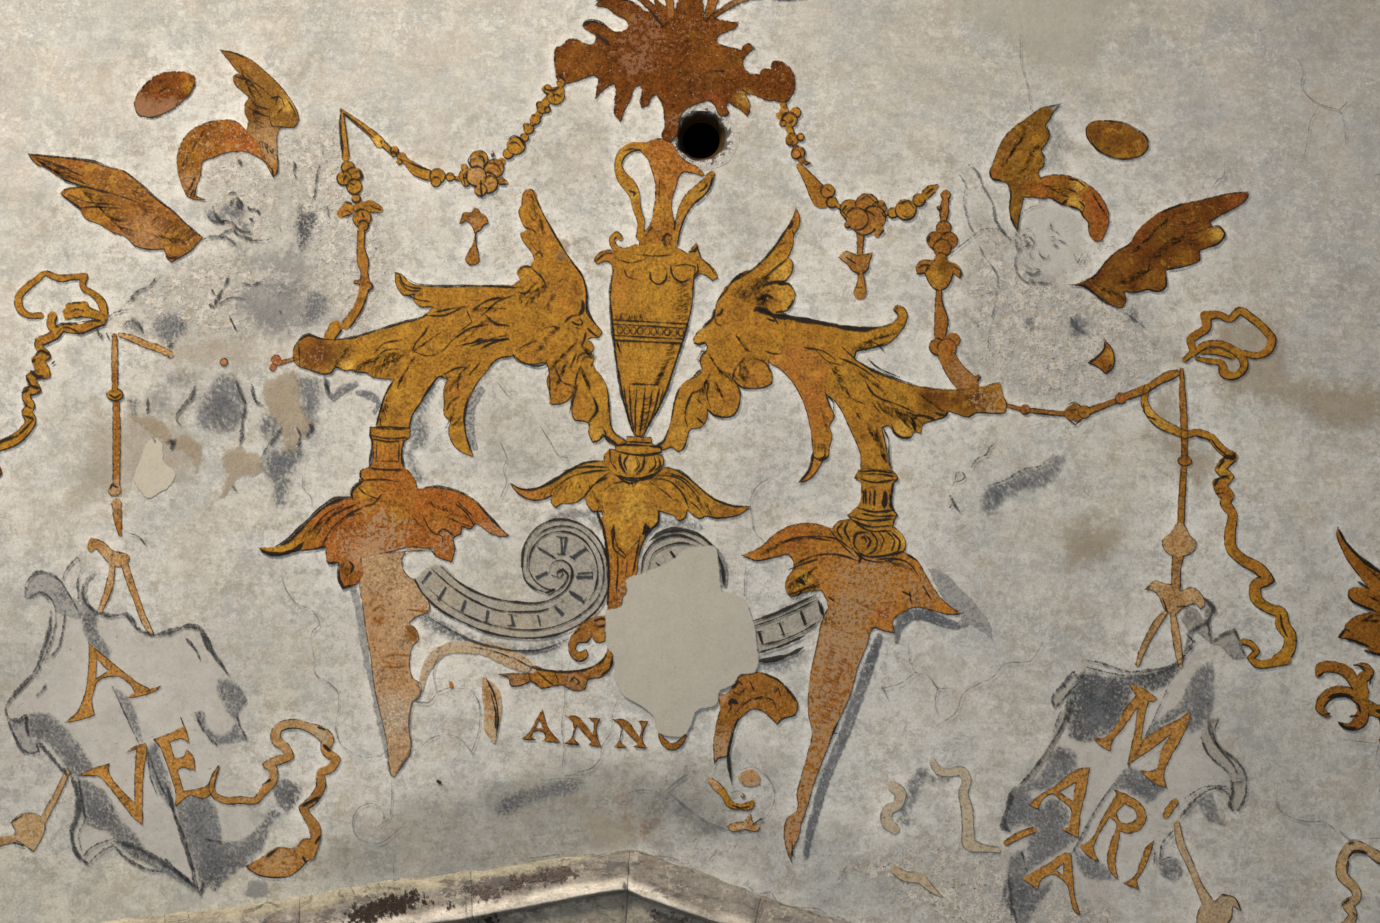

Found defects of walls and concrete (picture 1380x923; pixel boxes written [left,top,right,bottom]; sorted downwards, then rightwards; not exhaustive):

peeling [133,416,201,472]
peeling [220,446,262,497]